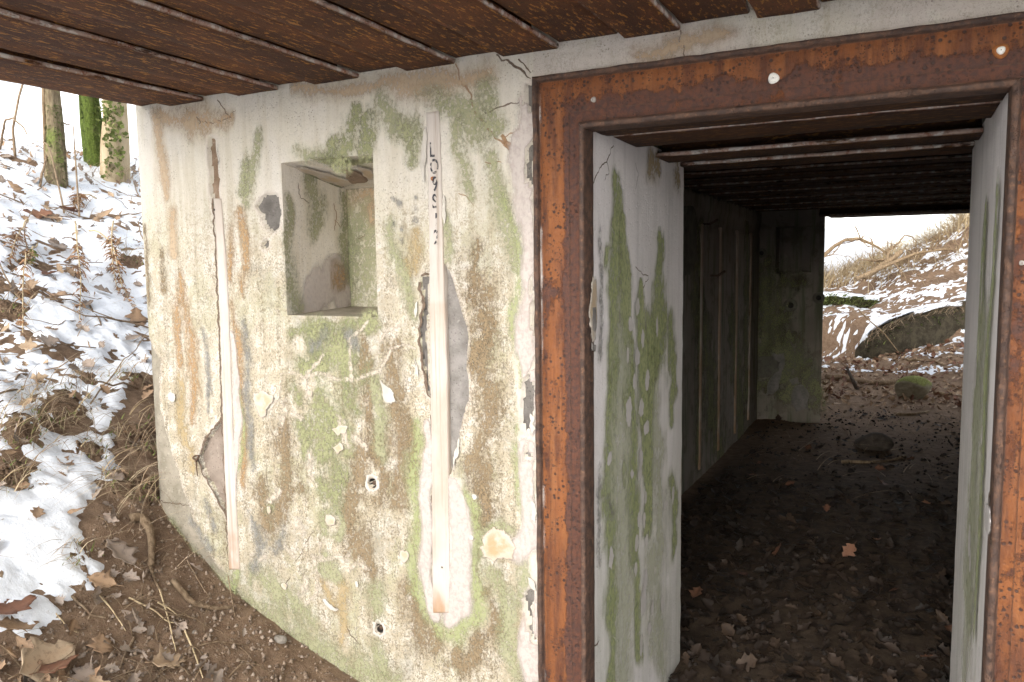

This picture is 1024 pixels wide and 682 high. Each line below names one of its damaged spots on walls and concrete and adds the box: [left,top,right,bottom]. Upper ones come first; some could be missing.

crack [496,54,531,79]
rust [143,108,234,475]
flaking render [151,344,240,595]
rust [227,206,250,296]
flaking render [259,195,284,248]
water stain [283,91,423,465]
flaking render [414,277,430,391]
flaking render [447,268,469,472]
water stain [419,420,539,682]
water stain [508,97,543,381]
flaking render [523,375,535,433]
water stain [597,169,678,682]